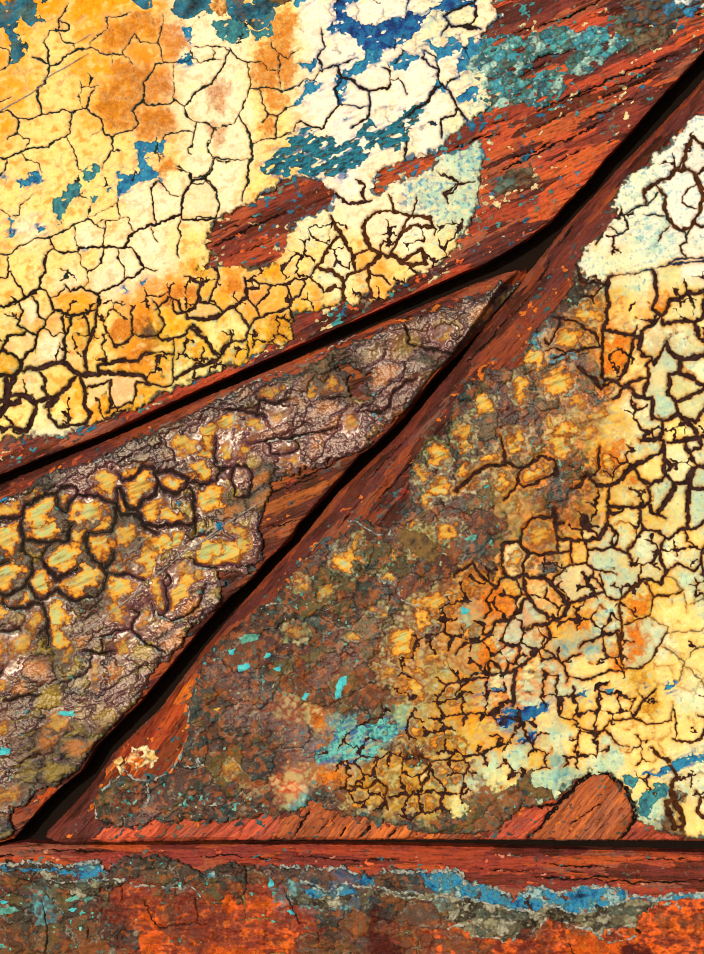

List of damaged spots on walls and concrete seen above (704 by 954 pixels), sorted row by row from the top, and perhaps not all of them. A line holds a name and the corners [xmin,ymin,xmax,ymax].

crack [514,0,600,33]
peeling [294,58,322,105]
crack [503,51,679,171]
crack [0,0,511,435]
peeling [194,101,483,276]
crack [0,398,341,655]
crack [4,693,42,701]
peeling [91,634,448,842]
peeling [478,752,704,840]
crack [0,848,111,858]
peeling [0,862,224,935]
peeling [280,864,704,944]